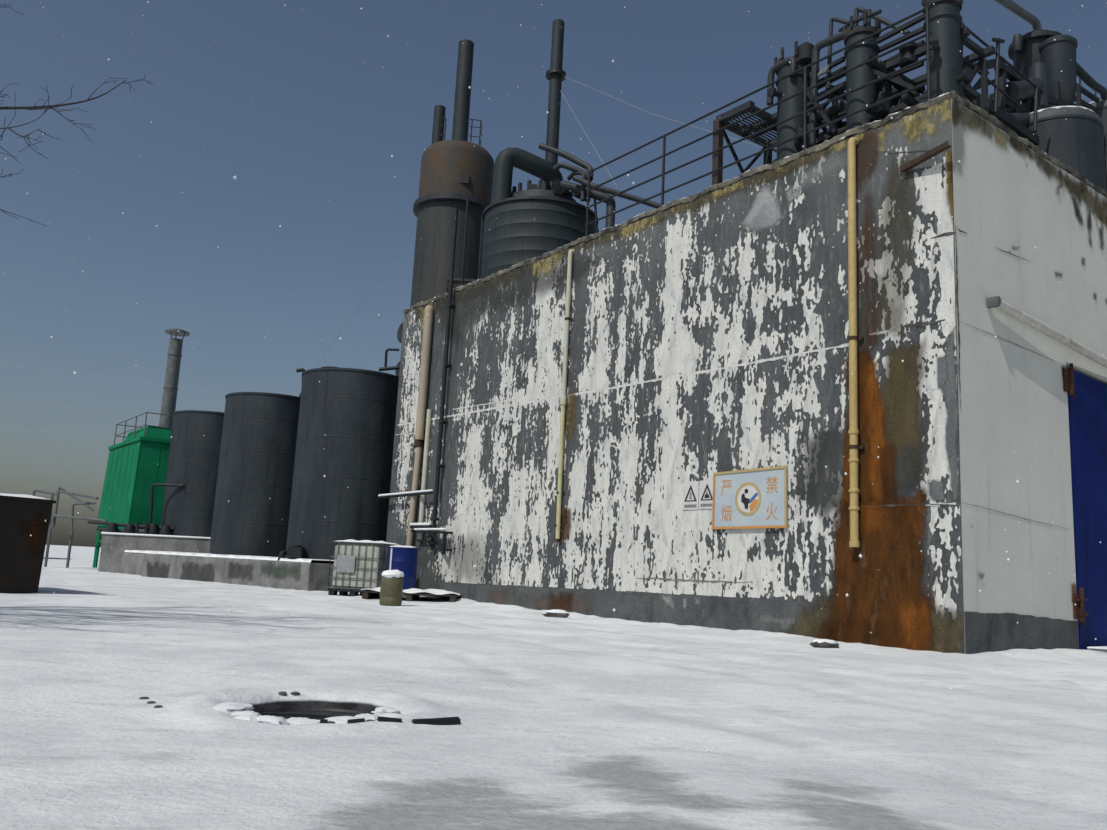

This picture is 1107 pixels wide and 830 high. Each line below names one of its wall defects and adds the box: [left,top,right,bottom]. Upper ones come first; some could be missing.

leakage [952,99,1107,249]
peeling [392,146,961,615]
corrosion [789,350,963,653]